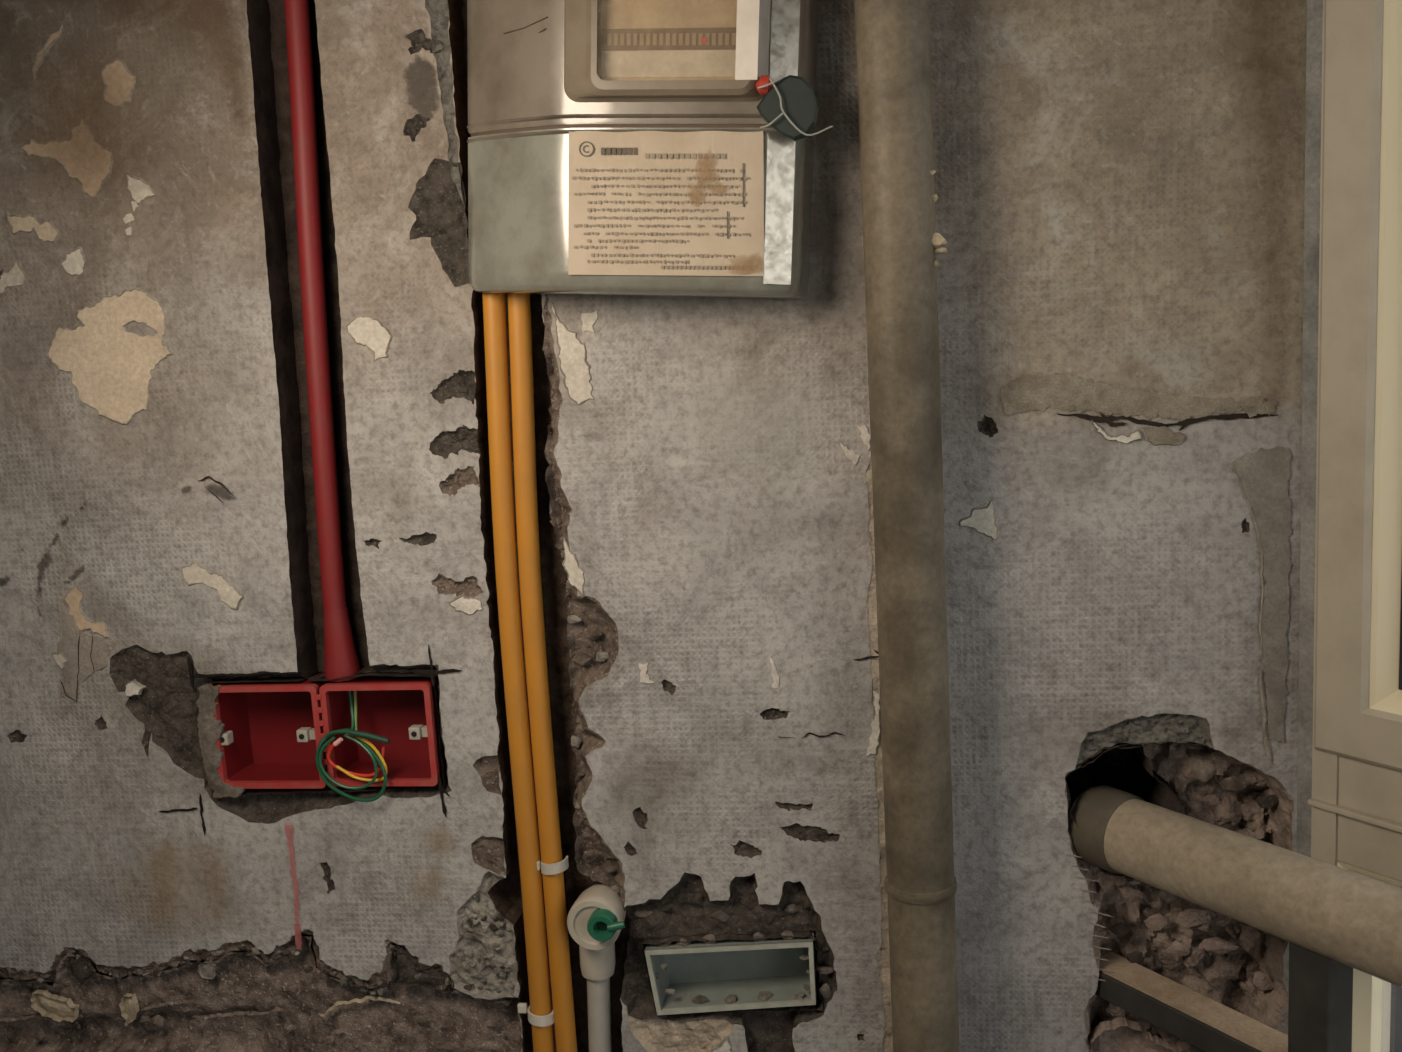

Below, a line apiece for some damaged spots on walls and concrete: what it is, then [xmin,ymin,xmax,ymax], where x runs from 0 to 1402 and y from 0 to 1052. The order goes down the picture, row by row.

peeling [20,119,157,235]
peeling [101,58,136,107]
flaking render [403,0,470,287]
peeling [48,288,173,425]
peeling [346,316,393,361]
crack [1001,372,1278,446]
flaking render [109,645,452,824]
flaking render [543,294,840,1052]
flaking render [0,836,523,1052]
flaking render [1064,713,1294,1052]